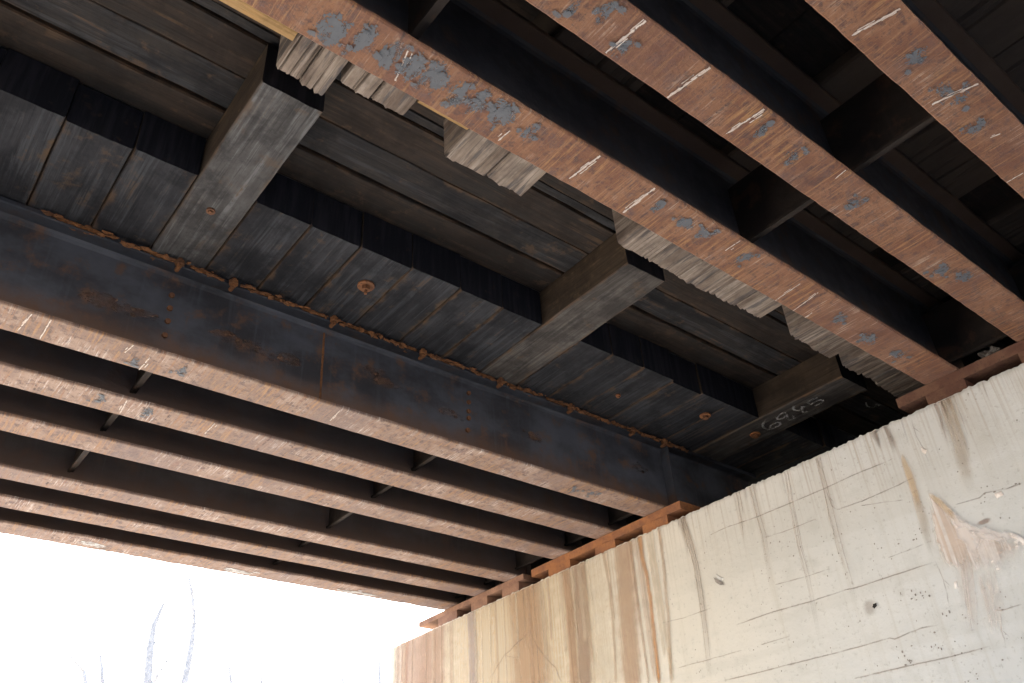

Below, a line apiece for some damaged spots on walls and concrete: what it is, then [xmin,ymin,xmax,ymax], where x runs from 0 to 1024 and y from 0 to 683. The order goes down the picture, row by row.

peeling [307,12,541,142]
peeling [927,81,988,134]
peeling [650,199,722,241]
rust [638,536,660,680]